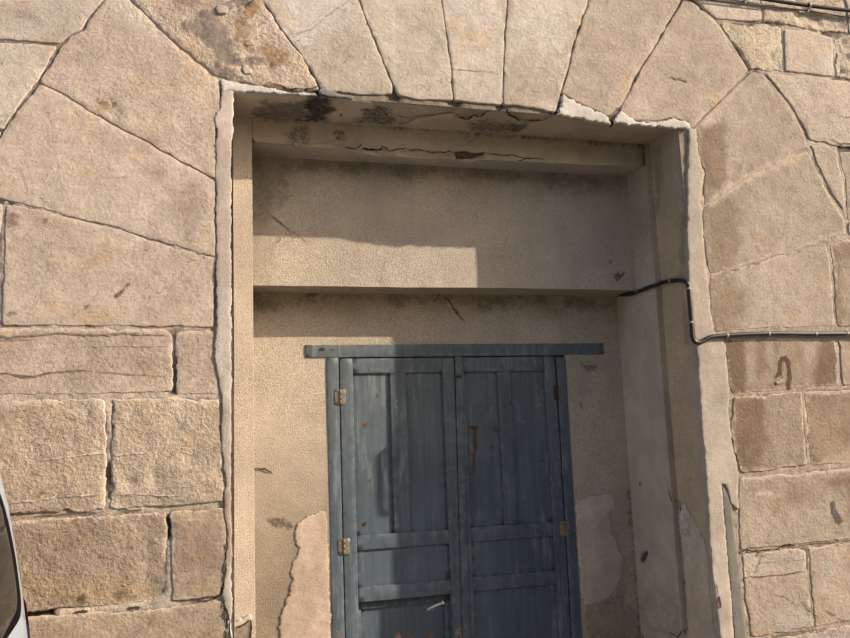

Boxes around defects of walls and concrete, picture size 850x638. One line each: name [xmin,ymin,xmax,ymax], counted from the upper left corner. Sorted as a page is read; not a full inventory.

leakage [253,94,342,145]
crack [308,107,553,161]